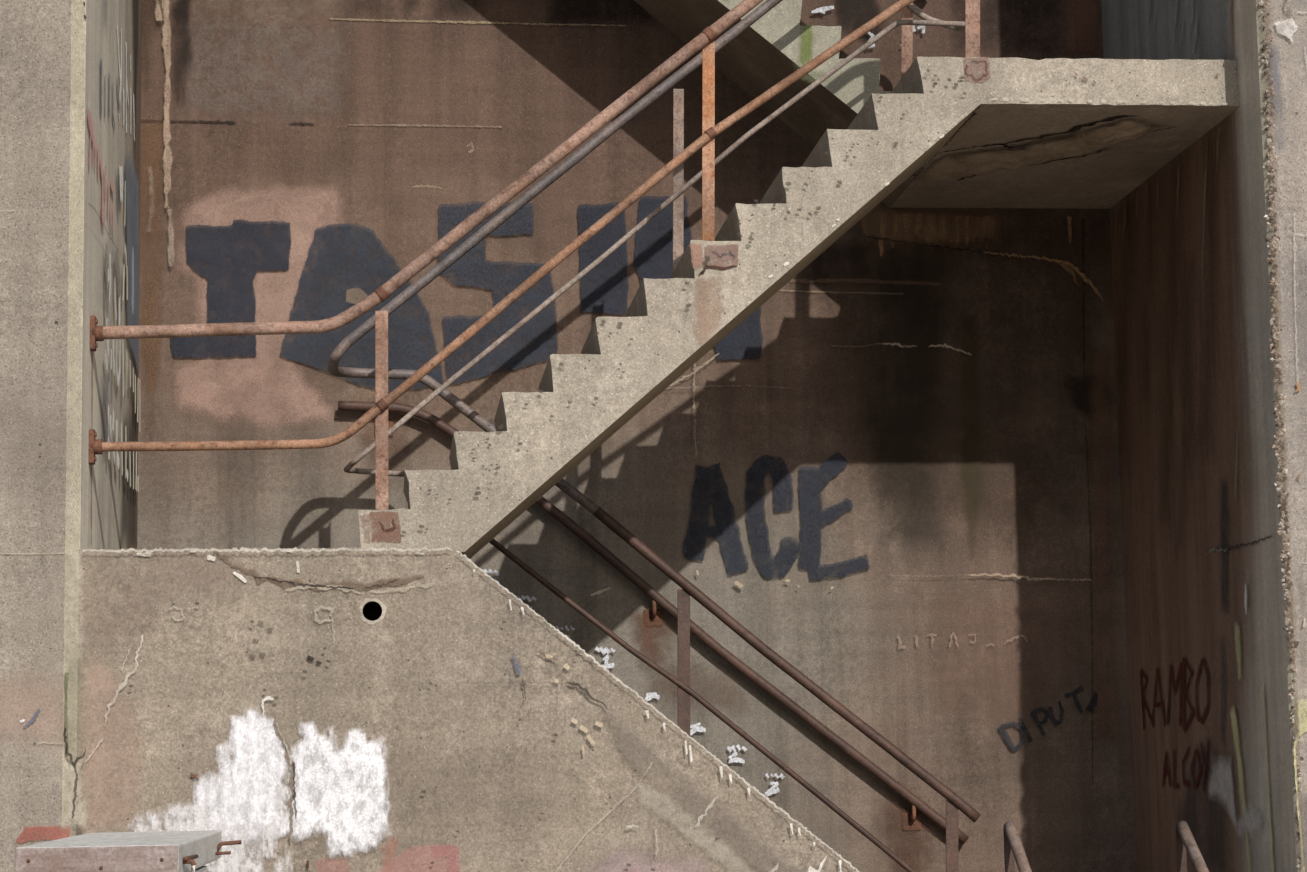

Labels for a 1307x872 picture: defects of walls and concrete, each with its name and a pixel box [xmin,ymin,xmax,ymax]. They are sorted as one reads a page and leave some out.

crack [943,106,980,147]
crack [863,236,1103,301]
corrosion [370,511,401,543]
crack [214,551,430,594]
leakage [82,421,859,872]
crack [39,634,143,819]